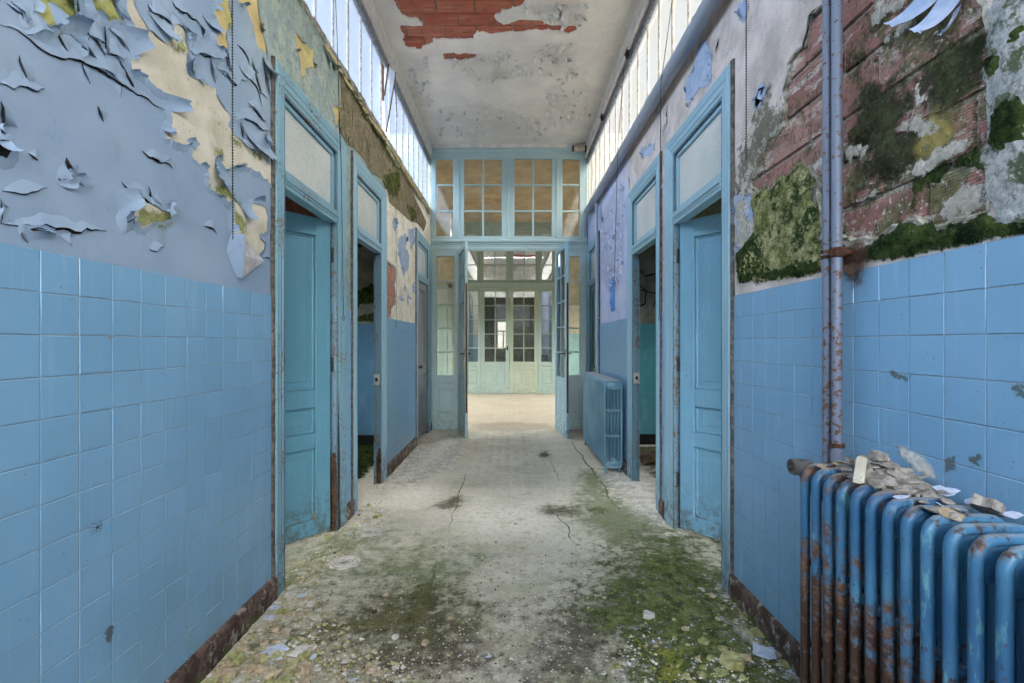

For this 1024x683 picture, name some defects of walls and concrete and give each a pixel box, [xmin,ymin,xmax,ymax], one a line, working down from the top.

peeling [0,130,23,170]
peeling [14,0,282,278]
spalling [391,0,591,141]
peeling [683,38,713,108]
spalling [731,0,822,262]
spalling [843,0,991,244]
water stain [913,113,959,158]
water stain [979,0,1024,241]
peeling [387,217,416,318]
crack [569,436,644,551]